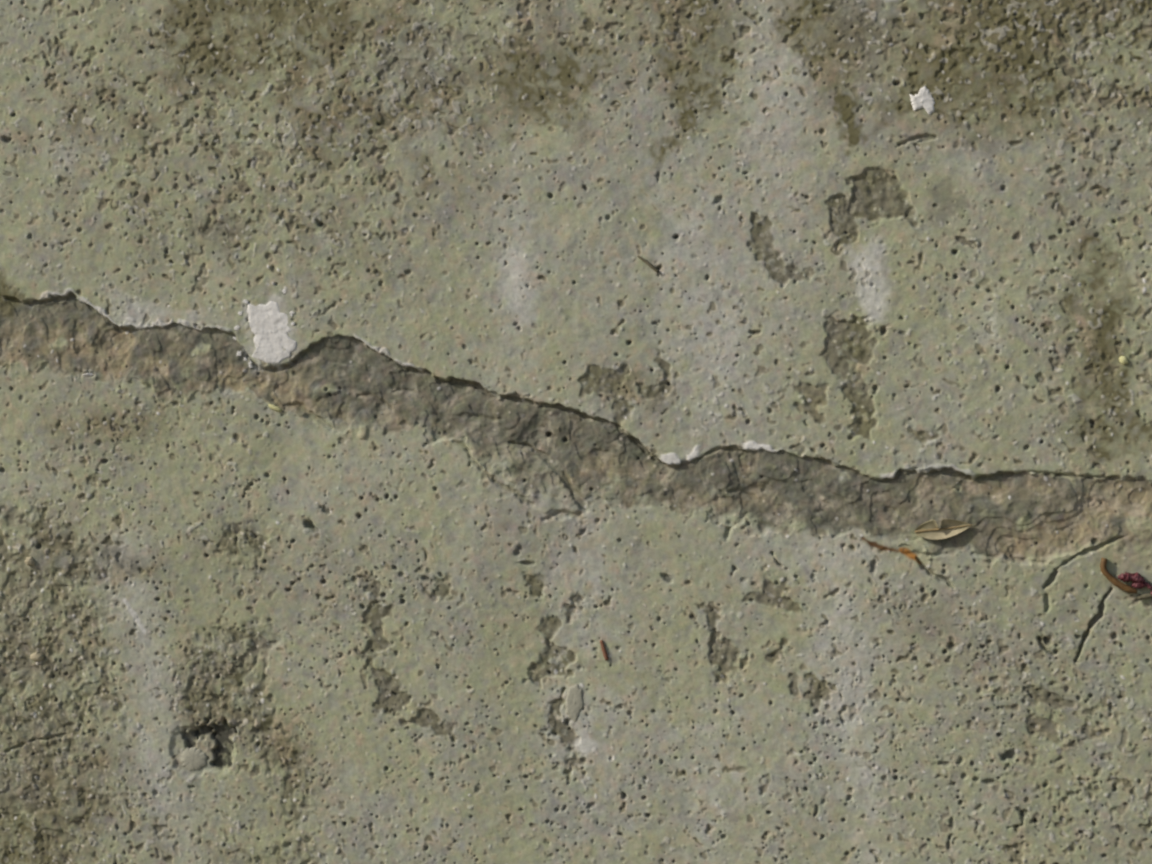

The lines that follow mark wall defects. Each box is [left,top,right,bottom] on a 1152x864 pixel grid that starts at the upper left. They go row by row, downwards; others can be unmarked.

leakage [846,235,891,324]
peeling [578,349,677,425]
peeling [794,315,878,440]
crack [0,288,1152,663]
peeling [904,423,938,443]
spalling [217,516,269,579]